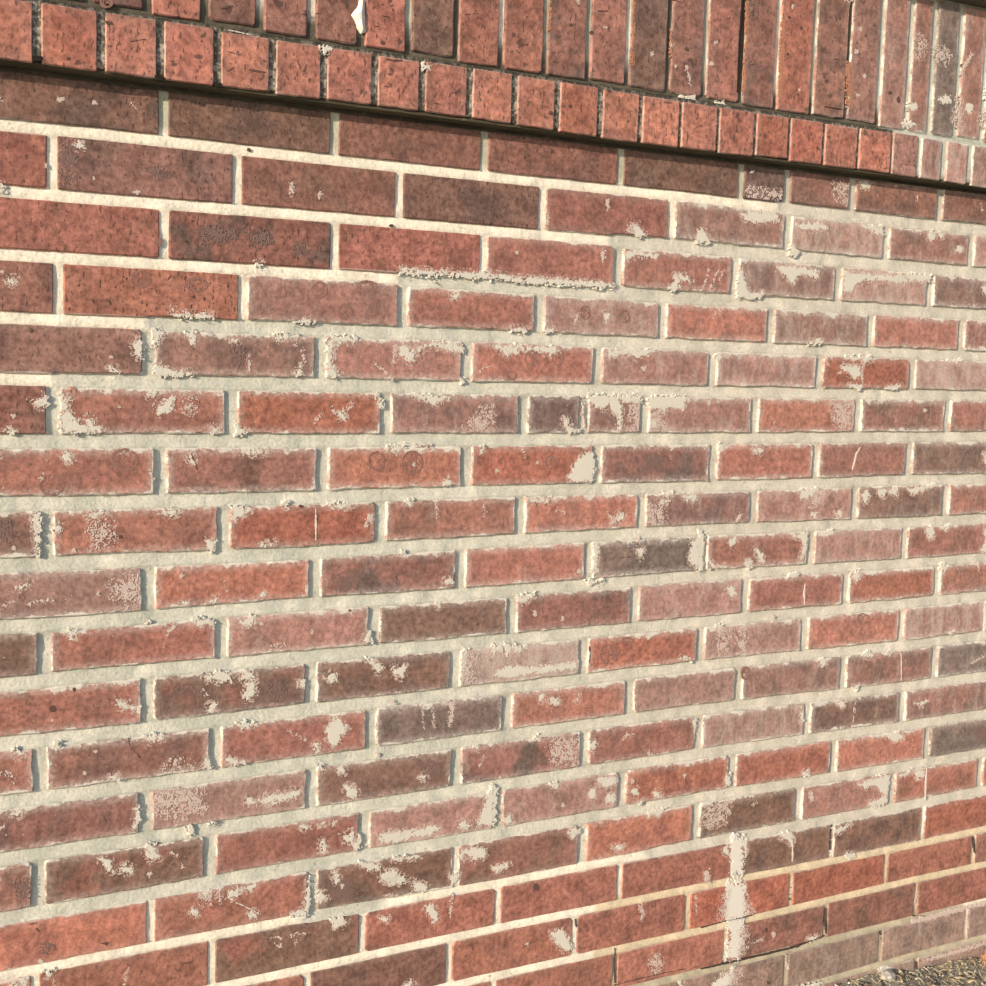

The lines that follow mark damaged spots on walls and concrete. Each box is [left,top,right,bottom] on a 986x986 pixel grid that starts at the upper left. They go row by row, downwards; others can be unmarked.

leakage [420,700,457,730]
leakage [322,878,356,905]
leakage [712,832,764,986]